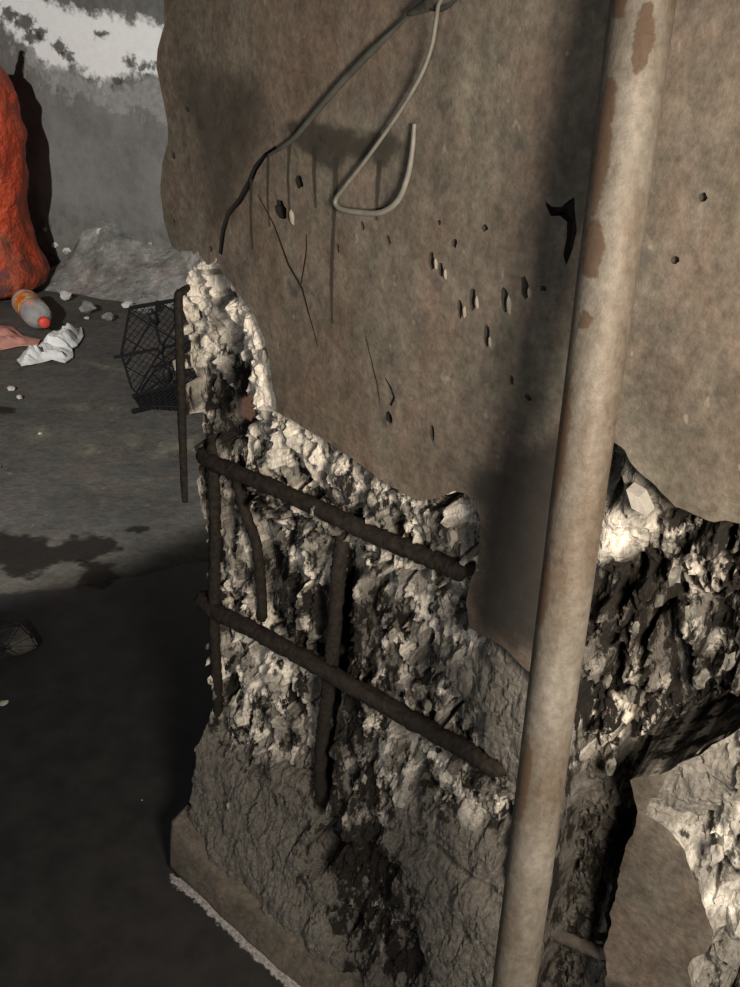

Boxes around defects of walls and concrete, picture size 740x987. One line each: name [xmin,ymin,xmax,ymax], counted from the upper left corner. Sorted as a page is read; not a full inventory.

corrosion [613,0,627,18]
corrosion [632,2,655,74]
crack [219,146,318,347]
spalling [521,276,531,300]
corrosion [583,77,617,278]
spalling [172,251,529,987]
spalling [536,443,740,987]